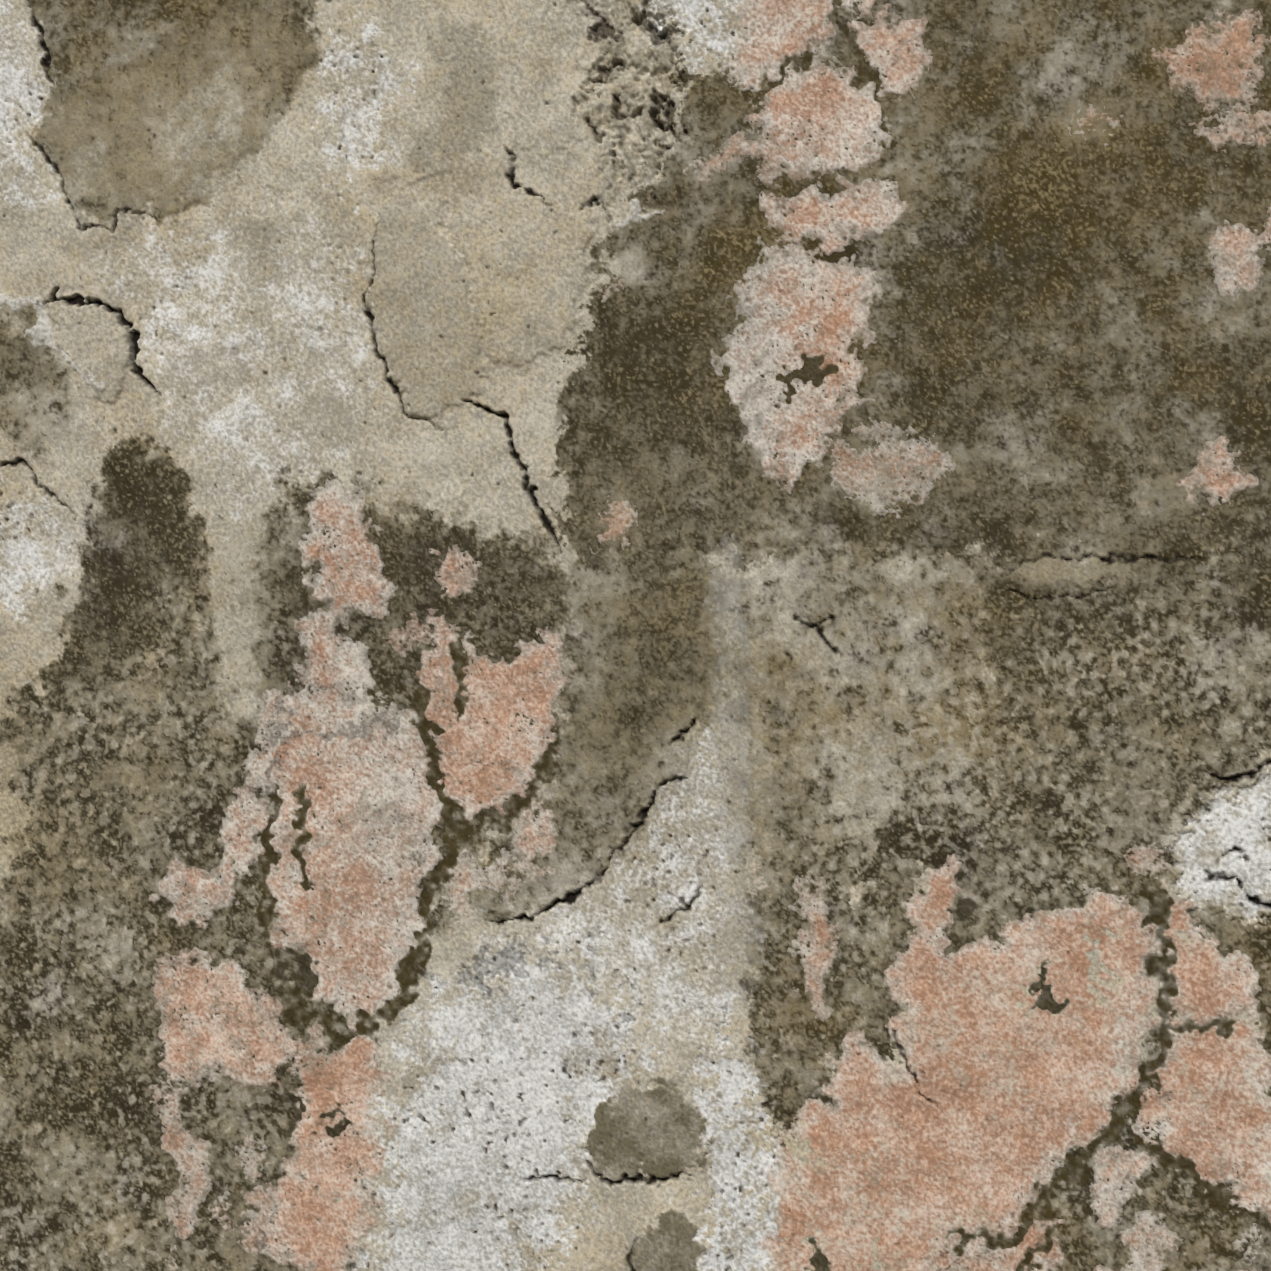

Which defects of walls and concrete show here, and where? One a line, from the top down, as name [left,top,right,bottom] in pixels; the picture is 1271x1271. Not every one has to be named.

crack [26,133,158,234]
crack [43,286,162,396]
crack [362,220,443,432]
peeling [565,0,958,519]
flaking render [0,0,444,1032]
peeling [429,544,483,604]
crack [461,398,563,554]
leakage [0,292,583,1271]
peeling [382,608,575,822]
crack [489,776,688,924]
peeling [149,728,1162,1271]
peeling [1088,765,1271,1271]